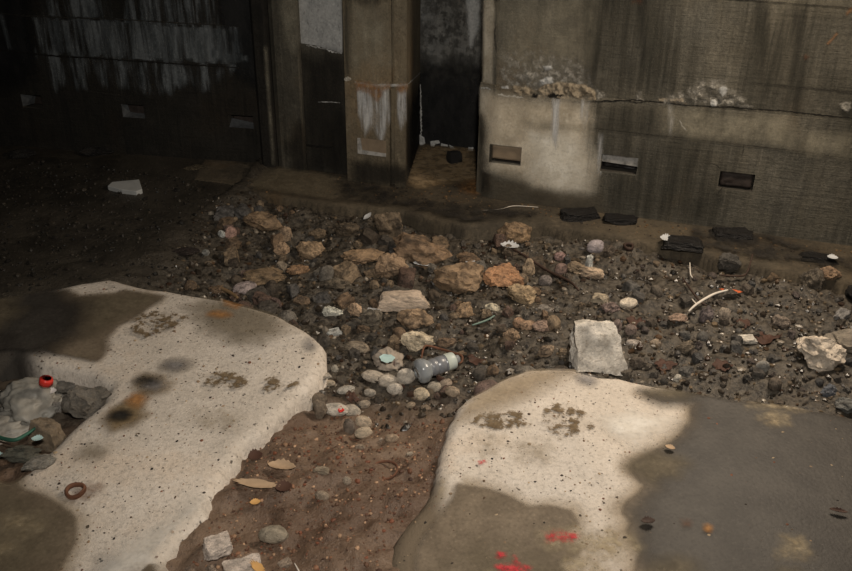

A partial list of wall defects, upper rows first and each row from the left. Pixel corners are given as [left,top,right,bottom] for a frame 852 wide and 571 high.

crack [492,3,500,52]
crack [740,0,852,9]
water stain [357,82,407,140]
spalling [501,66,605,101]
water stain [466,0,715,218]
crack [539,99,852,159]